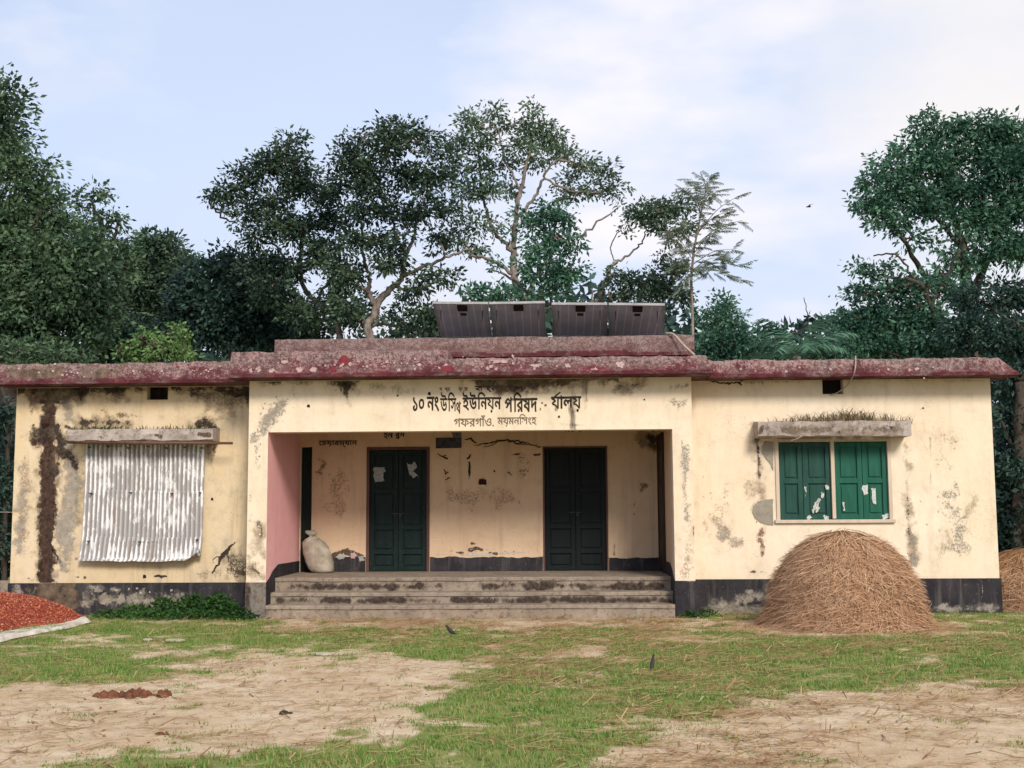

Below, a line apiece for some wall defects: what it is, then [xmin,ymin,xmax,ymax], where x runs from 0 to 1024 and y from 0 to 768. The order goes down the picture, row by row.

peeling [249,354,514,373]
peeling [556,361,625,370]
leakage [167,386,249,411]
leakage [475,378,619,393]
leakage [195,417,217,428]
crack [437,437,541,481]
leakage [13,366,144,611]
peeling [804,485,829,520]
peeling [56,437,183,609]
leakage [906,497,918,566]
crack [212,542,235,573]
spalling [435,542,524,556]